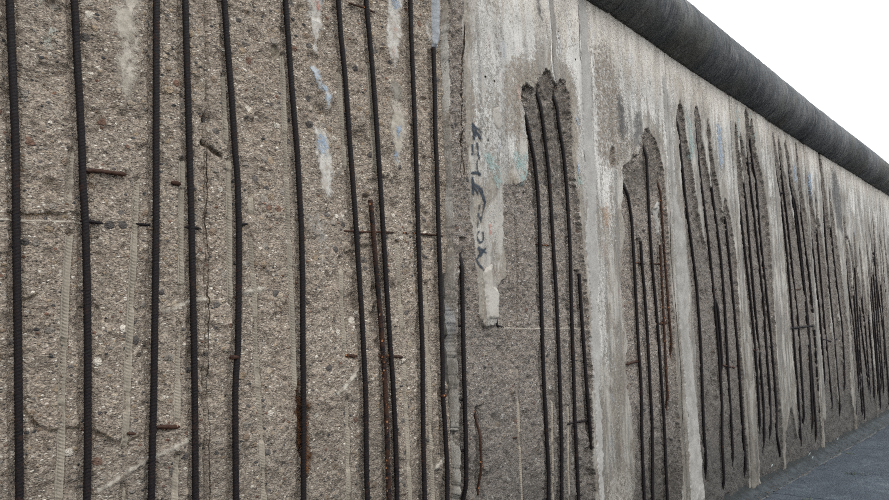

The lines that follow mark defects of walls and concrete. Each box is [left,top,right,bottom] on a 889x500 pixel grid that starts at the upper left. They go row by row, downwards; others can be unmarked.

crack [204,141,216,500]
corrosion [294,380,313,476]
spalling [447,0,596,500]
spalling [609,128,683,500]
spalling [676,101,889,500]